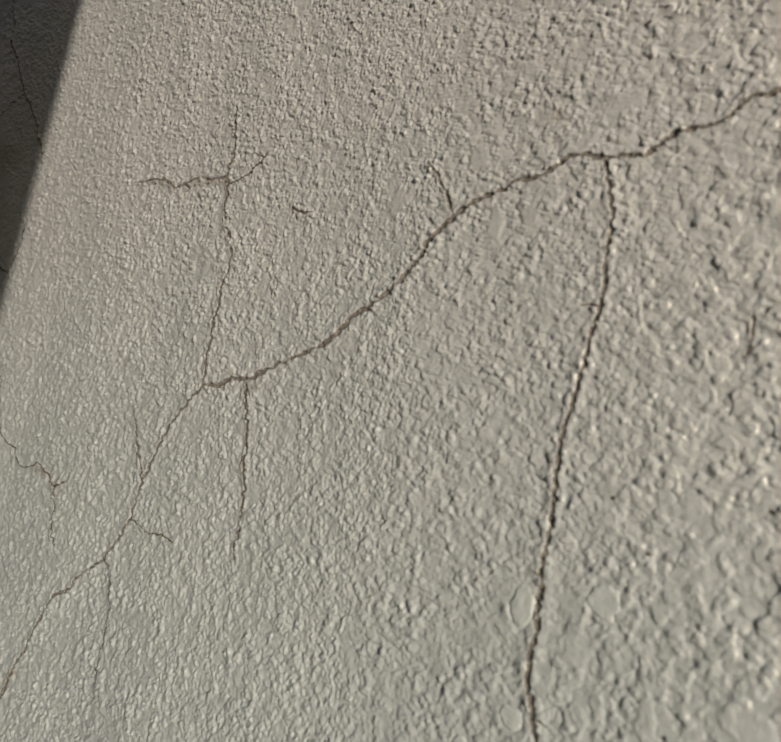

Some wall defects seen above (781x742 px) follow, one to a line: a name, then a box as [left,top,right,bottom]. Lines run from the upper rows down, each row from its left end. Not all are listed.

crack [0,0,43,163]
crack [139,105,271,220]
crack [0,383,204,699]
crack [203,87,781,561]
crack [524,159,614,742]